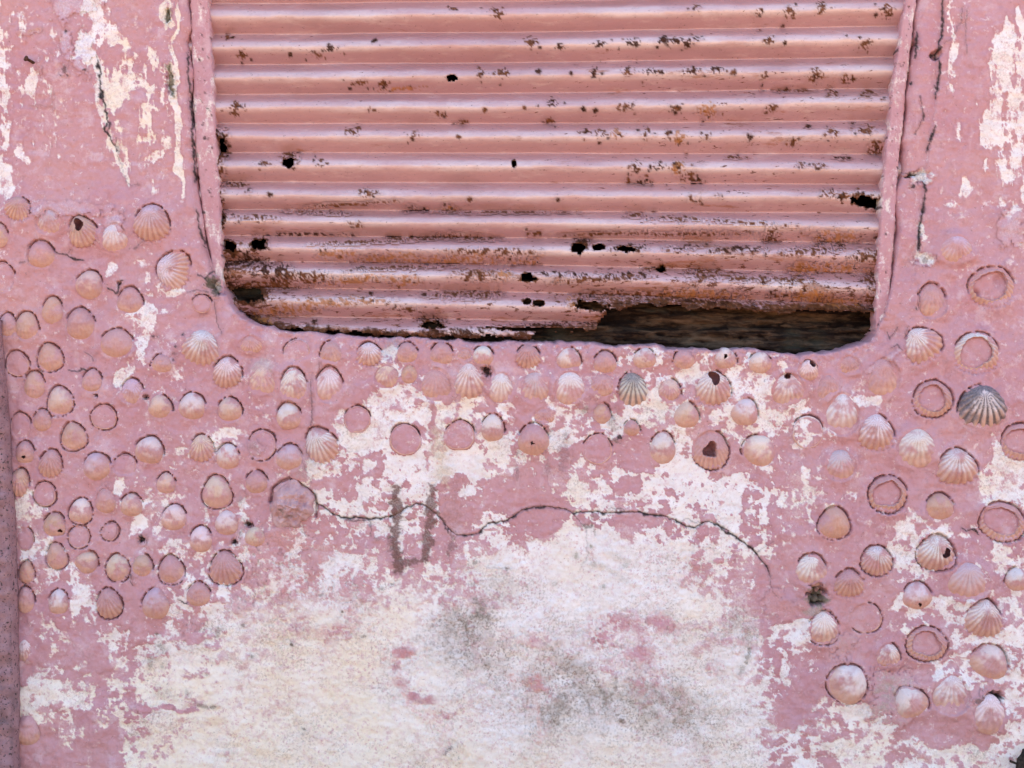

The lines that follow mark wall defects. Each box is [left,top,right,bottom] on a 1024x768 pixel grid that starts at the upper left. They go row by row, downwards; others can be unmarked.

peeling [0,0,201,267]
crack [95,55,141,188]
corrosion [287,41,347,63]
corrosion [341,77,439,93]
corrosion [589,32,738,85]
corrosion [759,65,888,117]
crack [906,0,969,154]
corrosion [216,96,885,339]
crack [916,182,929,252]
peeling [837,0,1024,421]
peeling [0,219,1024,768]
crack [310,478,775,589]